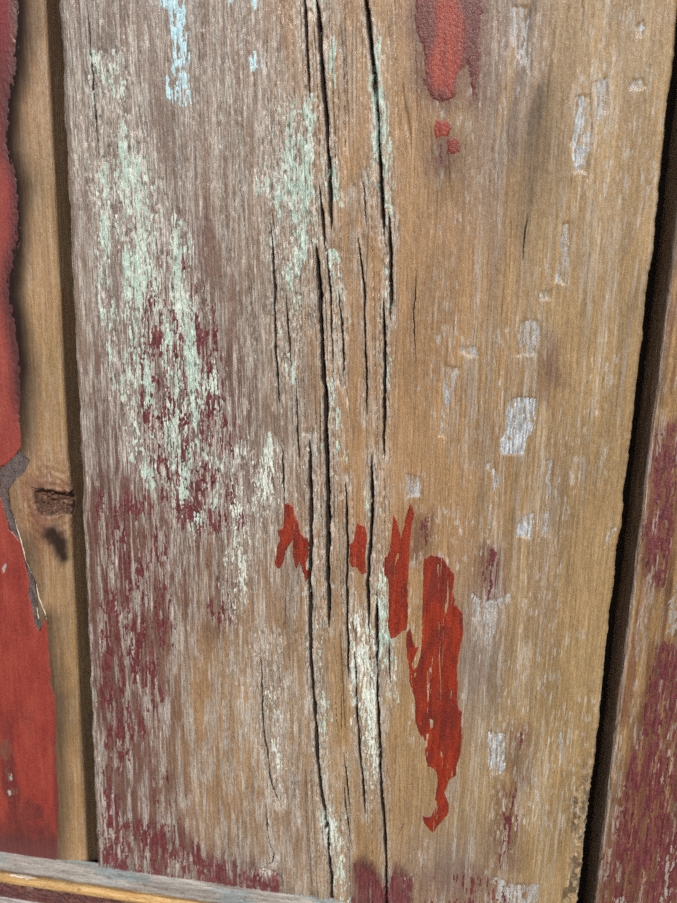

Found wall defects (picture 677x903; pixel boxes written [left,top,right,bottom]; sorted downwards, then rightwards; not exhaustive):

peeling [414,0,484,103]
peeling [434,119,460,154]
crack [271,0,417,903]
peeling [0,451,47,629]
peeling [275,503,310,582]
peeling [349,522,367,575]
peeling [383,475,511,833]
peeling [665,584,677,636]
crack [260,656,280,865]
peeling [660,845,677,903]